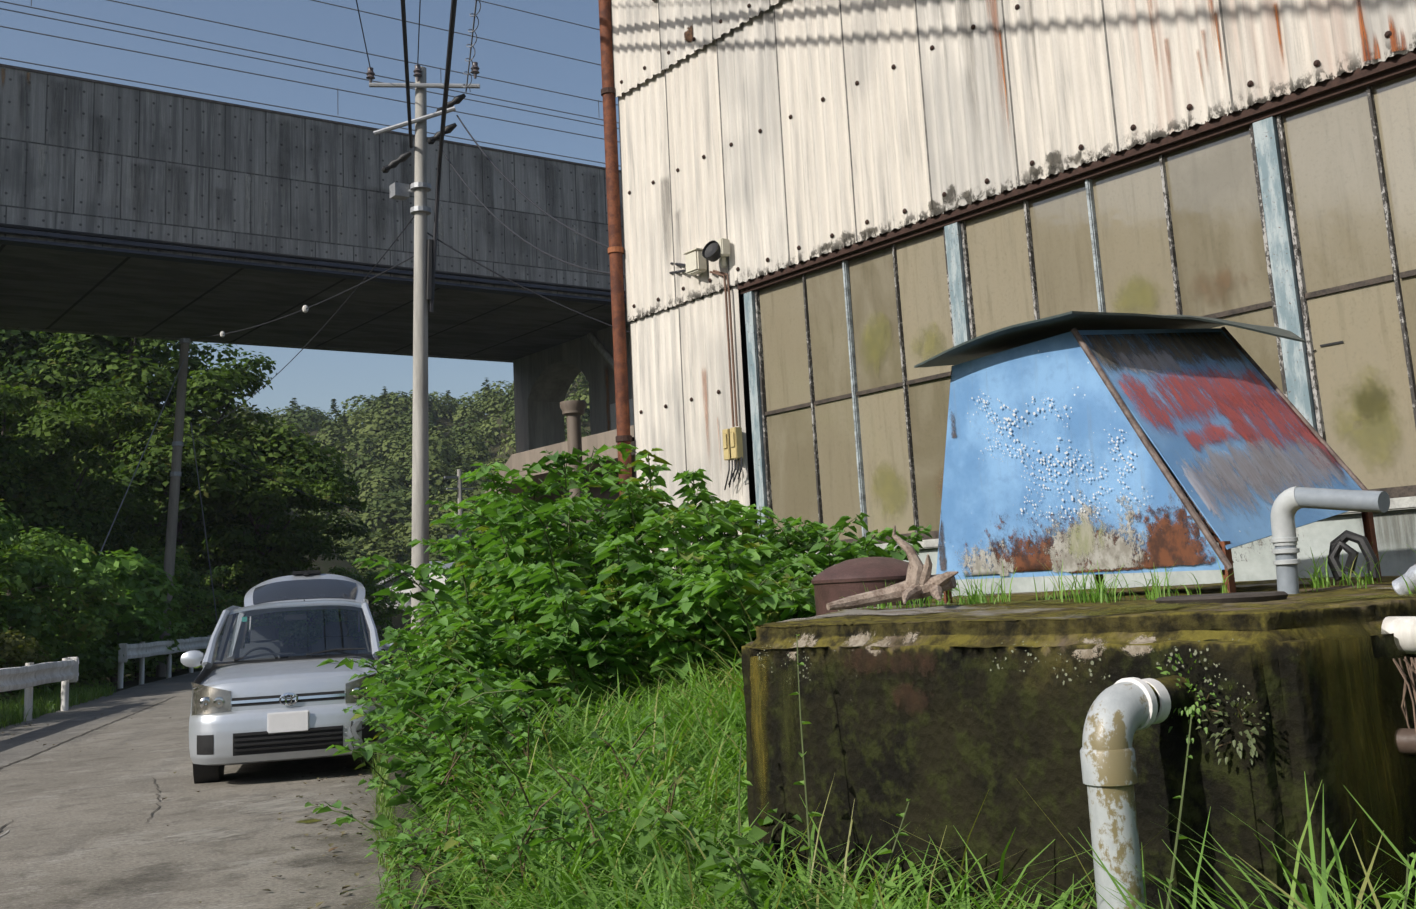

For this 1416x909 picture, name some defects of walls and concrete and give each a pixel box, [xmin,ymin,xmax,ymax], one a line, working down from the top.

rust [990,0,1008,117]
rust [1198,0,1222,78]
rust [1274,4,1283,54]
rust [1358,5,1406,61]
water stain [928,185,971,211]
water stain [1029,150,1081,176]
peeling [958,391,1346,577]
spalling [1068,634,1156,662]
crack [0,696,176,768]
water stain [1315,627,1416,885]